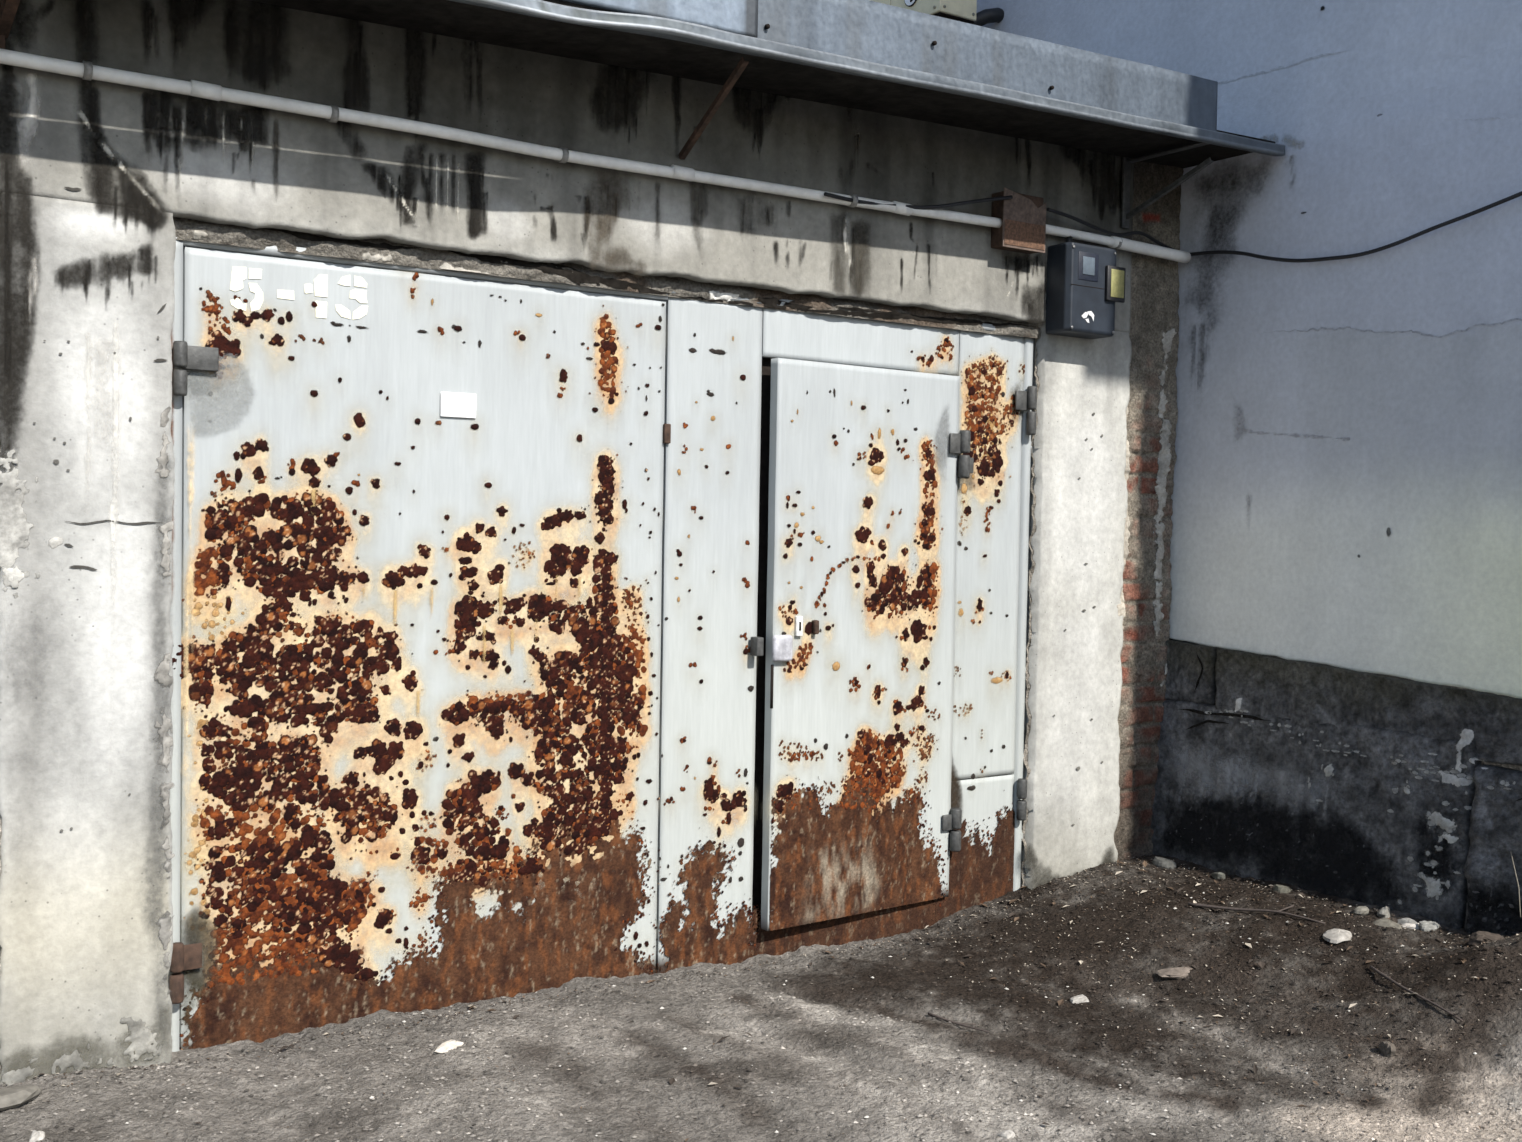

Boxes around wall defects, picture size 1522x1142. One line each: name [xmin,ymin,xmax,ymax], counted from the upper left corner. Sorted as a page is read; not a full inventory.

damp [143,91,279,179]
damp [338,18,488,238]
rust [199,287,325,396]
damp [541,207,557,239]
damp [578,173,642,270]
rust [581,305,662,416]
damp [834,216,870,294]
damp [901,223,930,286]
damp [1005,256,1047,326]
crack [1263,318,1522,338]
spalling [0,448,40,598]
rust [172,336,1025,1050]